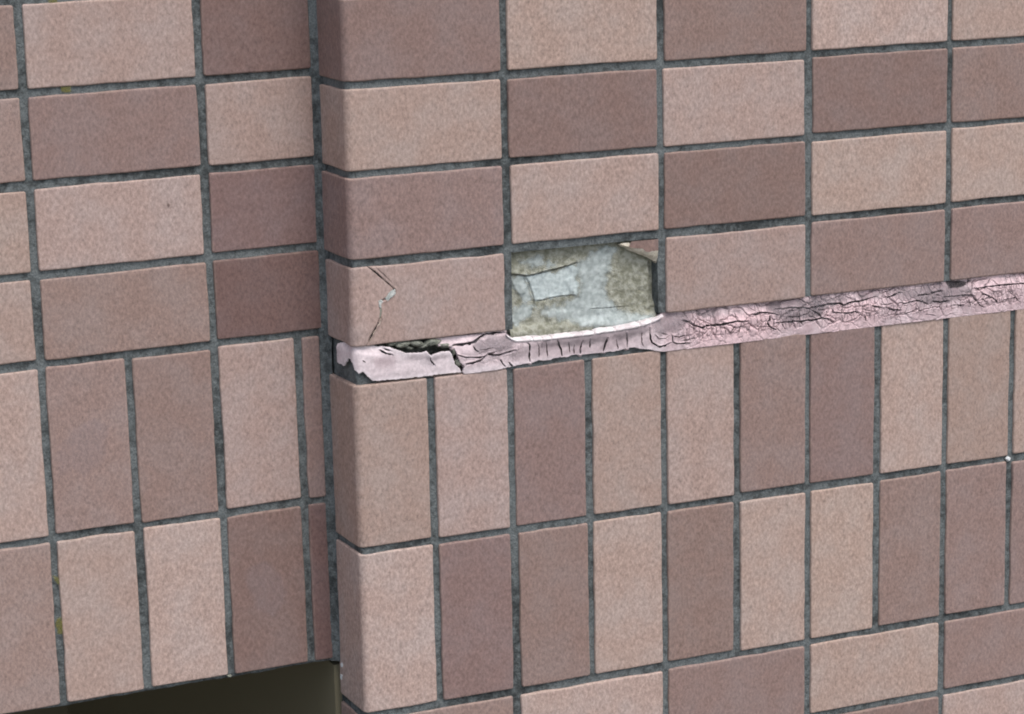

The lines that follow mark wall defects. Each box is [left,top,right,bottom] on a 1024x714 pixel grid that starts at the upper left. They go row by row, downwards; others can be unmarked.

crack [367,266,396,343]
peeling [336,342,461,381]
spalling [507,239,663,342]
crack [454,283,1024,366]